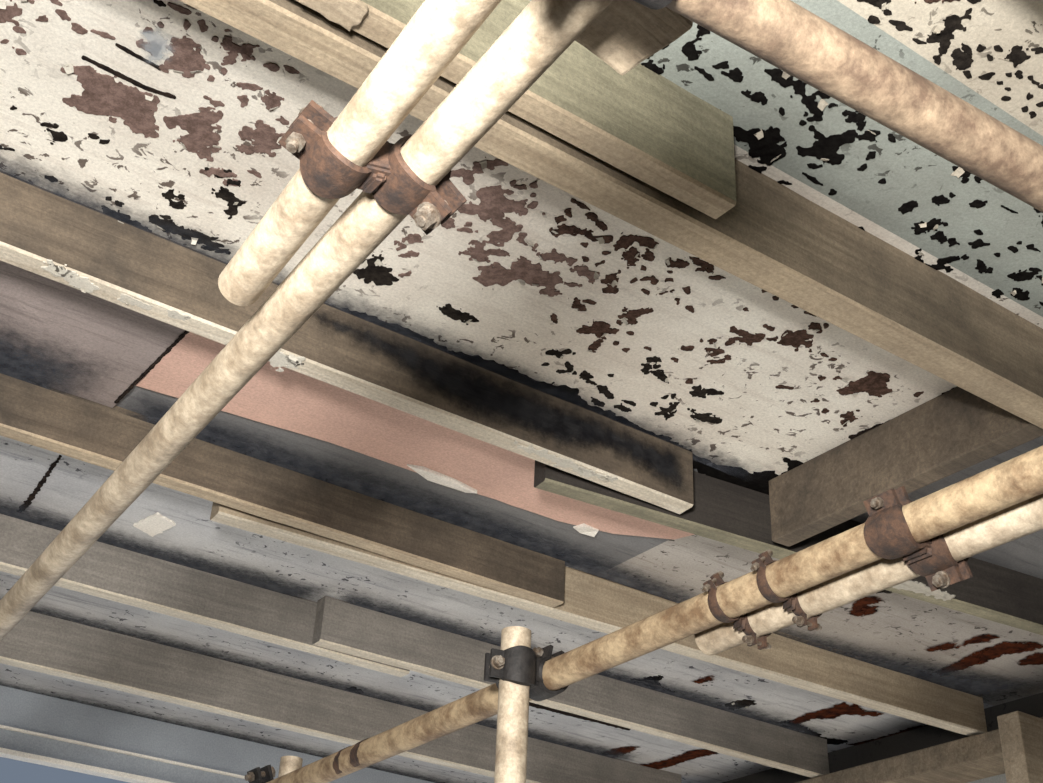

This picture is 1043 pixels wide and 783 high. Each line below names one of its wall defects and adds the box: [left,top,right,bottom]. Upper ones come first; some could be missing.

peeling [857,0,1043,119]
peeling [60,63,262,219]
peeling [733,68,896,195]
peeling [898,192,1041,273]
peeling [436,157,803,495]
peeling [641,305,837,424]
crack [19,455,62,510]
rust [849,597,881,617]
rust [926,634,1043,672]
rust [607,746,639,755]
rust [641,749,719,769]
rust [788,702,882,724]